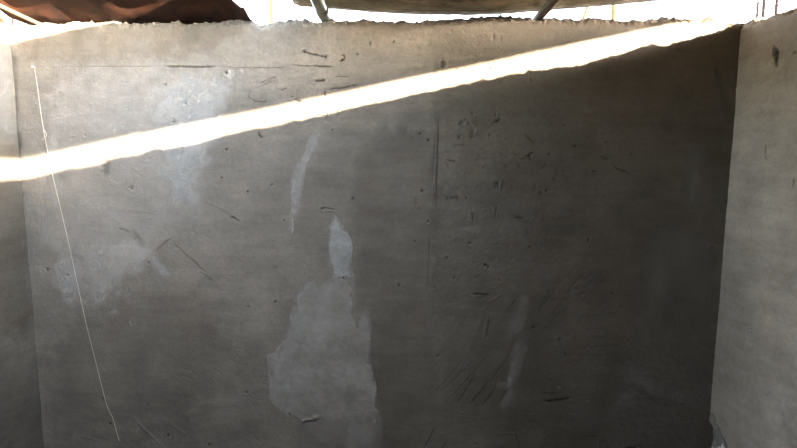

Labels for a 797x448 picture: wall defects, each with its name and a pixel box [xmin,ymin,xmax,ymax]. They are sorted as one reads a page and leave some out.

damp [268,216,379,426]